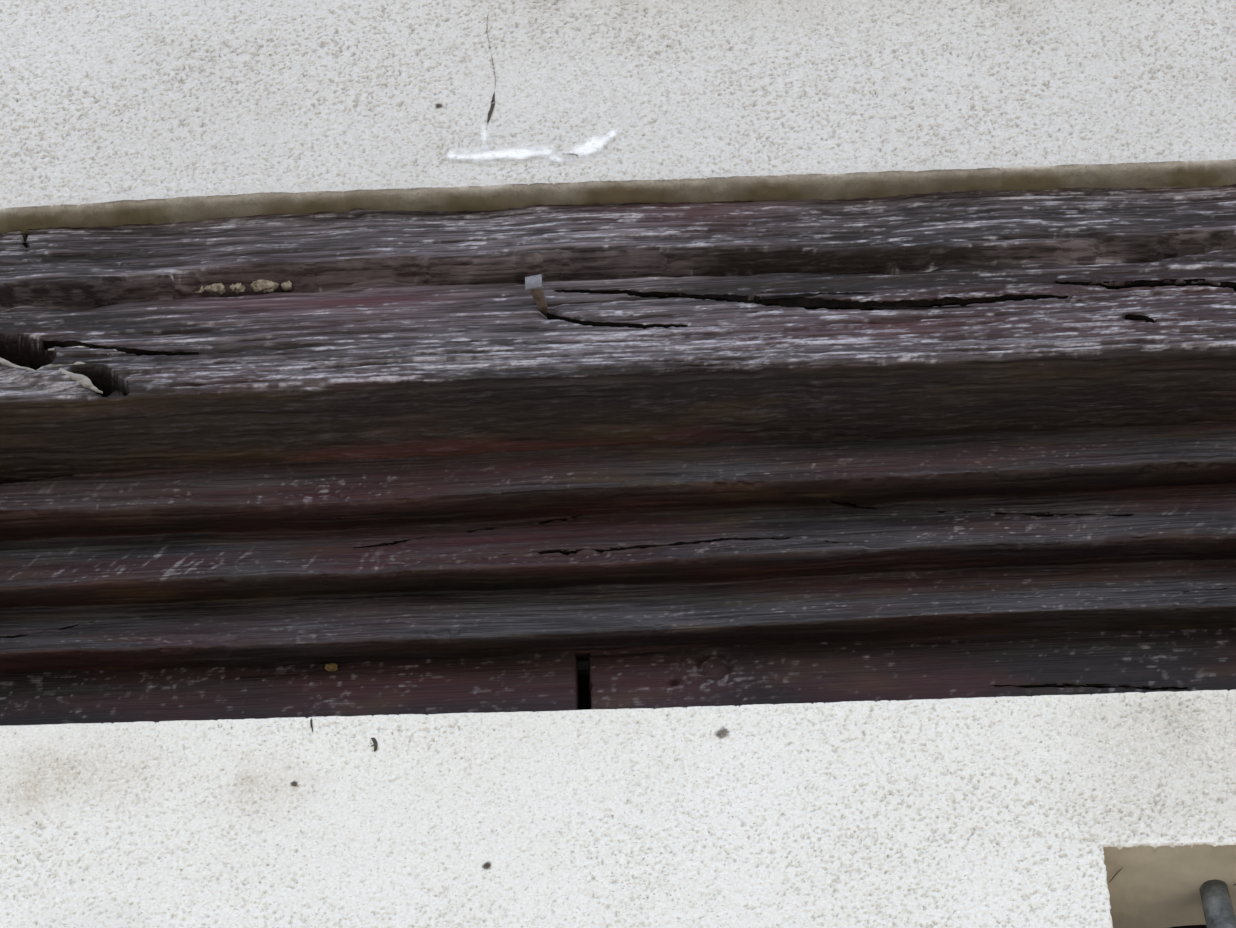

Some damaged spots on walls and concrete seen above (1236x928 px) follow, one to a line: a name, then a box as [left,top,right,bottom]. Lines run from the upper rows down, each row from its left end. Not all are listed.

crack [484,12,496,150]
crack [547,278,1236,329]
crack [43,340,199,356]
crack [824,500,1145,517]
crack [354,515,839,556]